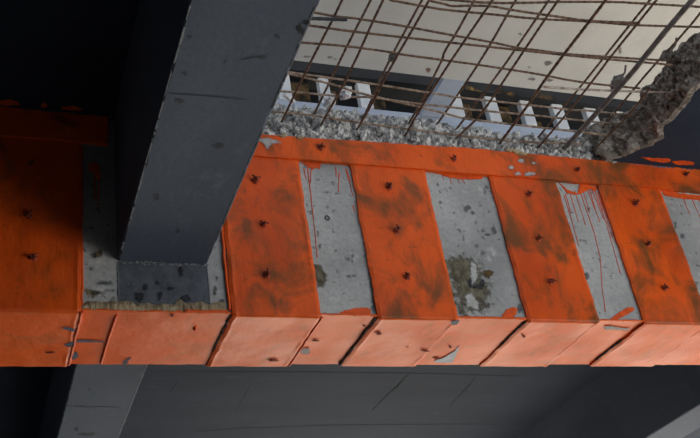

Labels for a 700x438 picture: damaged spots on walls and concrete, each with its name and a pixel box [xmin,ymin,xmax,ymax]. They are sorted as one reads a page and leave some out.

spalling [259,32,700,176]
peeling [435,346,459,363]